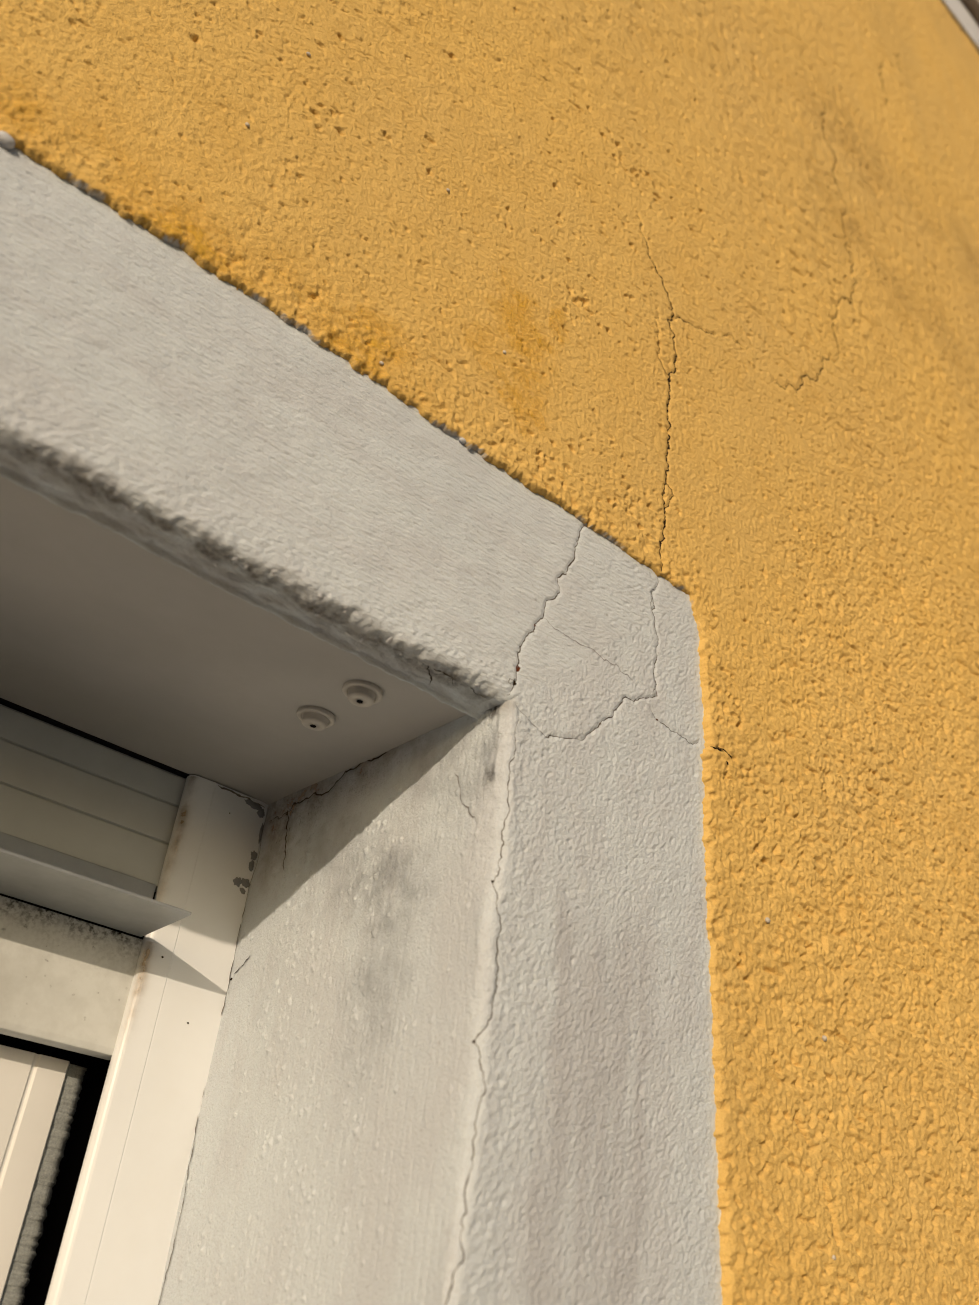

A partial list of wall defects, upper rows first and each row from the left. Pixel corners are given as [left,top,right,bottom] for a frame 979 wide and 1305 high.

crack [423,224,744,1305]
crack [776,108,857,393]